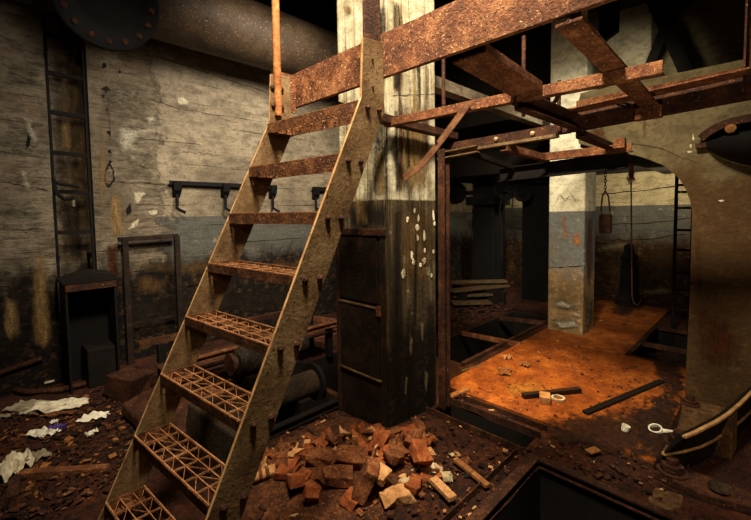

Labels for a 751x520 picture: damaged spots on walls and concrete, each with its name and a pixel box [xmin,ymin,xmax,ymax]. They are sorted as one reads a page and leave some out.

damp [380,3,400,35]
crack [152,100,262,123]
damp [5,277,22,352]
damp [33,252,50,347]
damp [347,124,435,418]
peeling [406,208,434,267]
rust [564,218,592,283]